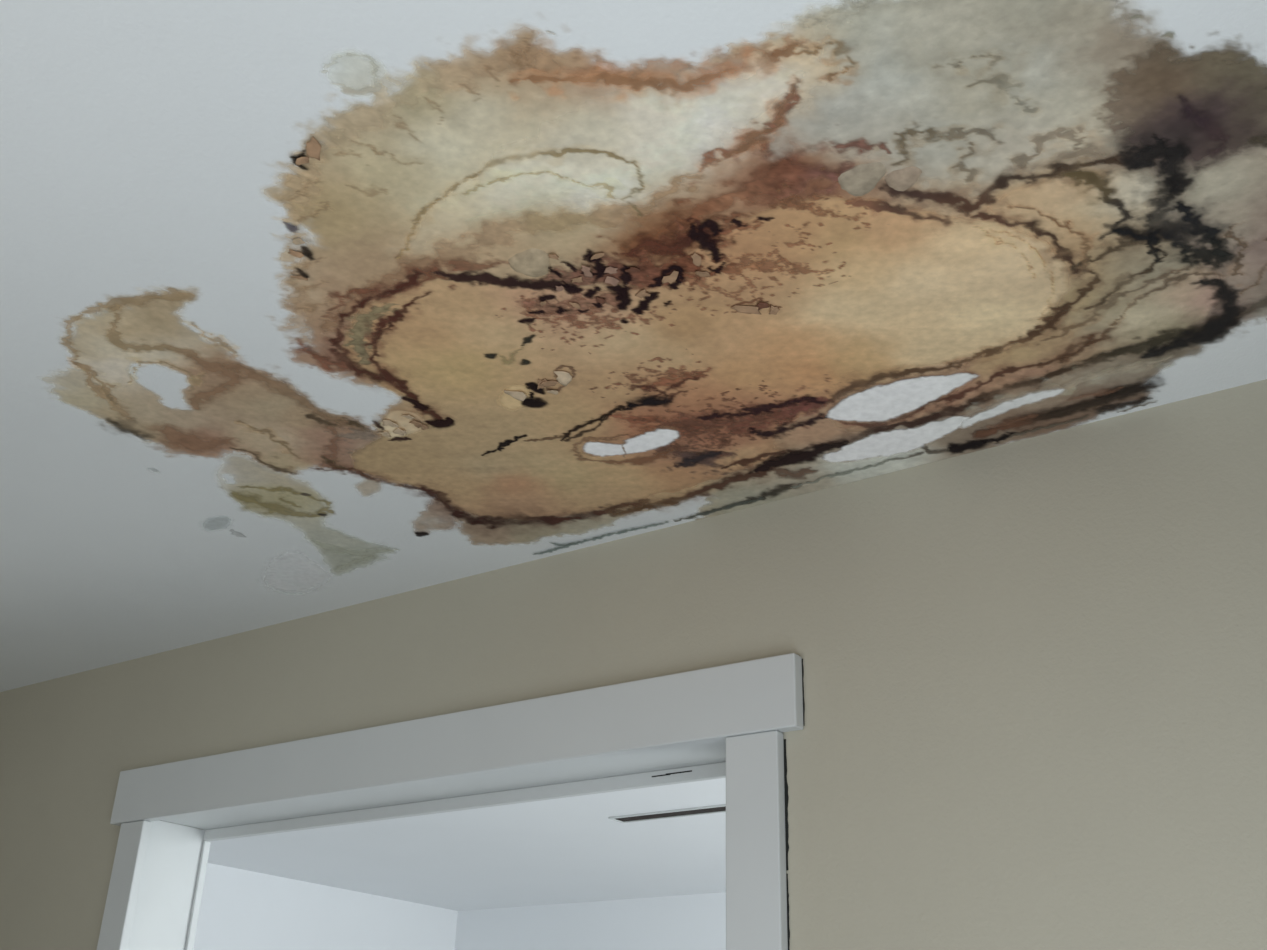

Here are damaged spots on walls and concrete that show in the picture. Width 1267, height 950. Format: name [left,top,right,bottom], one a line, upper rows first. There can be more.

leakage [44,0,1267,575]
peeling [573,428,679,465]
peeling [822,373,1064,462]